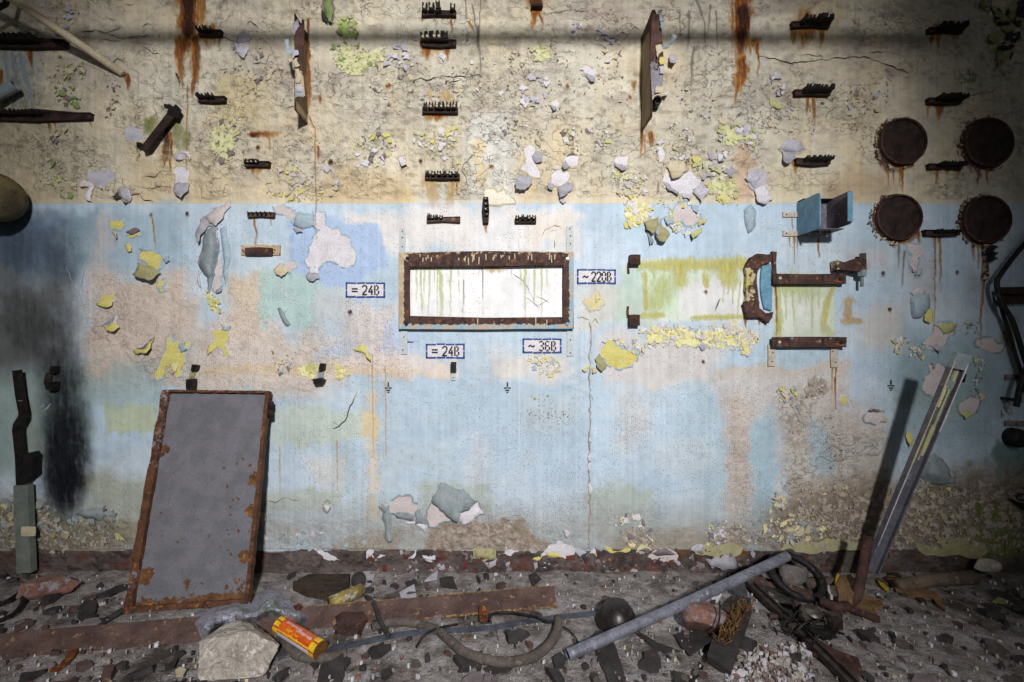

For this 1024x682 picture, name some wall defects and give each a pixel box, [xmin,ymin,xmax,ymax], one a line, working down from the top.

rust [174,0,221,132]
rust [731,0,760,101]
crack [759,51,911,73]
peeling [320,0,892,249]
rust [878,153,912,185]
peeling [109,218,169,293]
peeling [265,162,358,281]
damp [638,256,747,320]
rust [934,237,942,297]
peeling [582,319,762,374]
peeling [258,375,895,574]
crack [579,317,598,550]